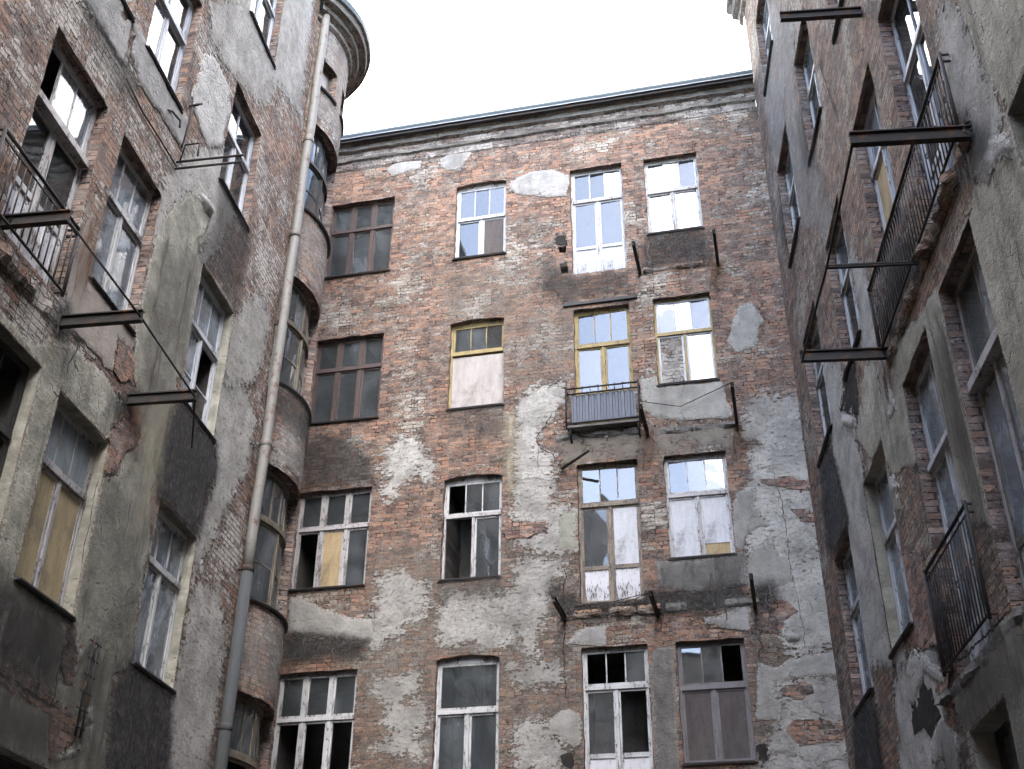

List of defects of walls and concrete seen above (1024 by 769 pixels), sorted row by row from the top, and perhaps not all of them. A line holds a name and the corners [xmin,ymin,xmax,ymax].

peeling [848,246,881,348]
spalling [112,339,136,398]
spalling [103,406,142,481]
peeling [361,376,849,769]
crack [756,464,805,643]
peeling [822,360,964,769]
spalling [60,625,85,684]
spalling [0,664,95,762]